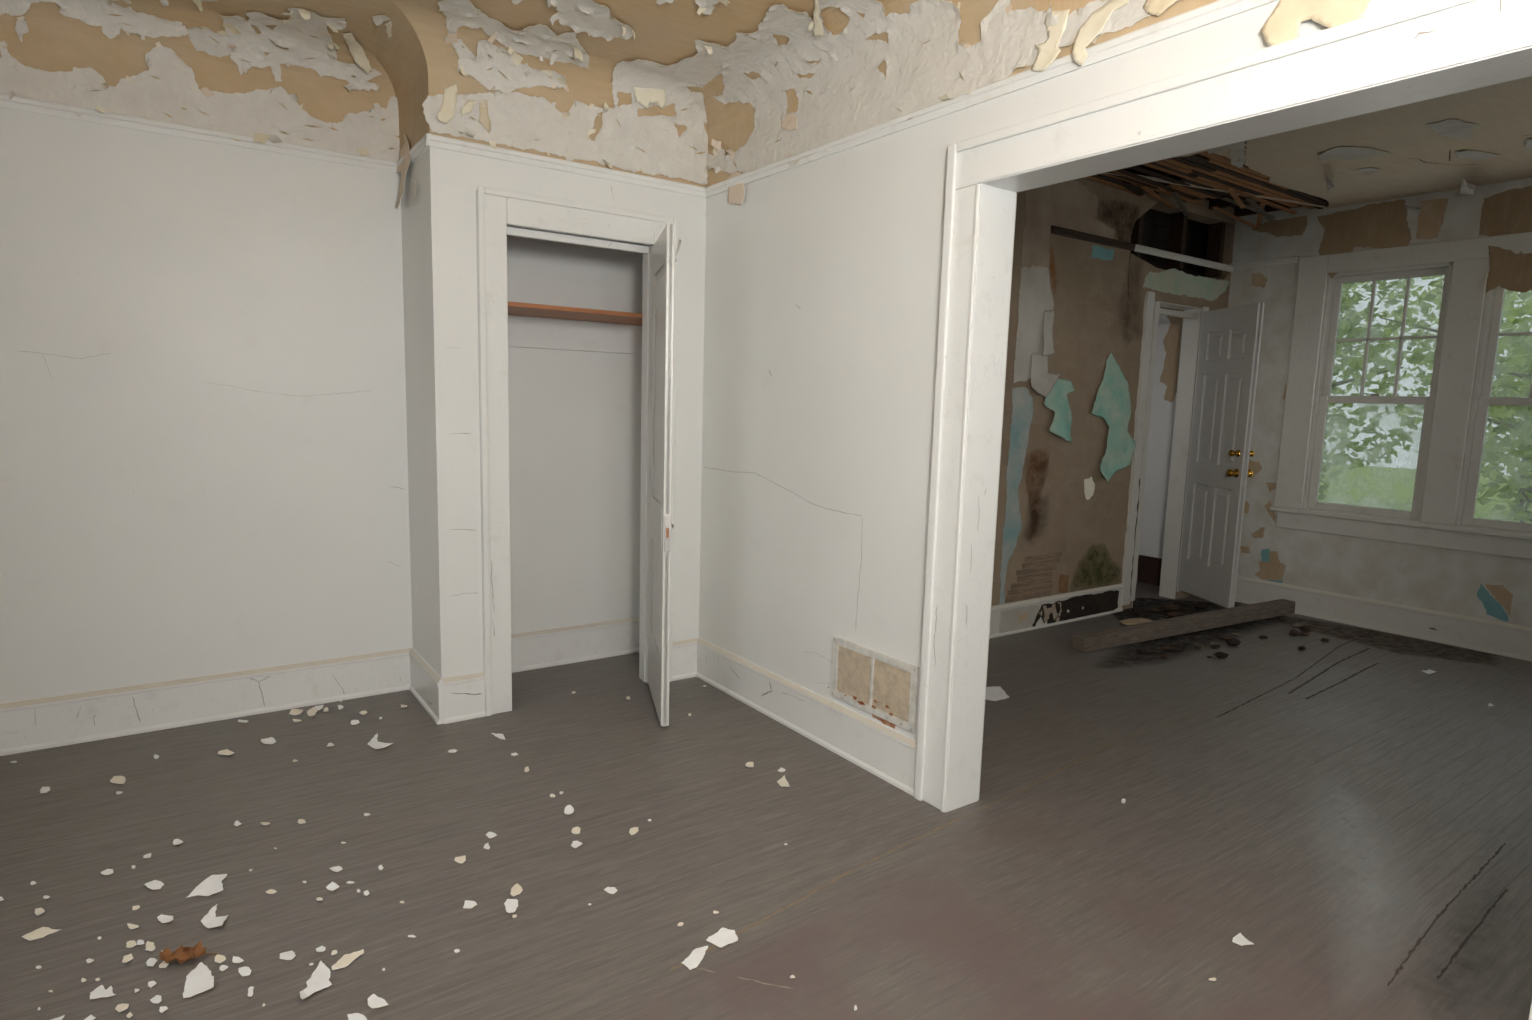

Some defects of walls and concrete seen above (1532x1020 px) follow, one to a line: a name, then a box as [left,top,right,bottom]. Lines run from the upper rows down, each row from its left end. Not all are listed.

peeling [0,0,411,209]
peeling [422,0,1152,205]
peeling [1207,141,1246,168]
spalling [1252,198,1449,255]
spalling [1479,186,1532,237]
spalling [1143,268,1230,403]
peeling [1084,477,1095,500]